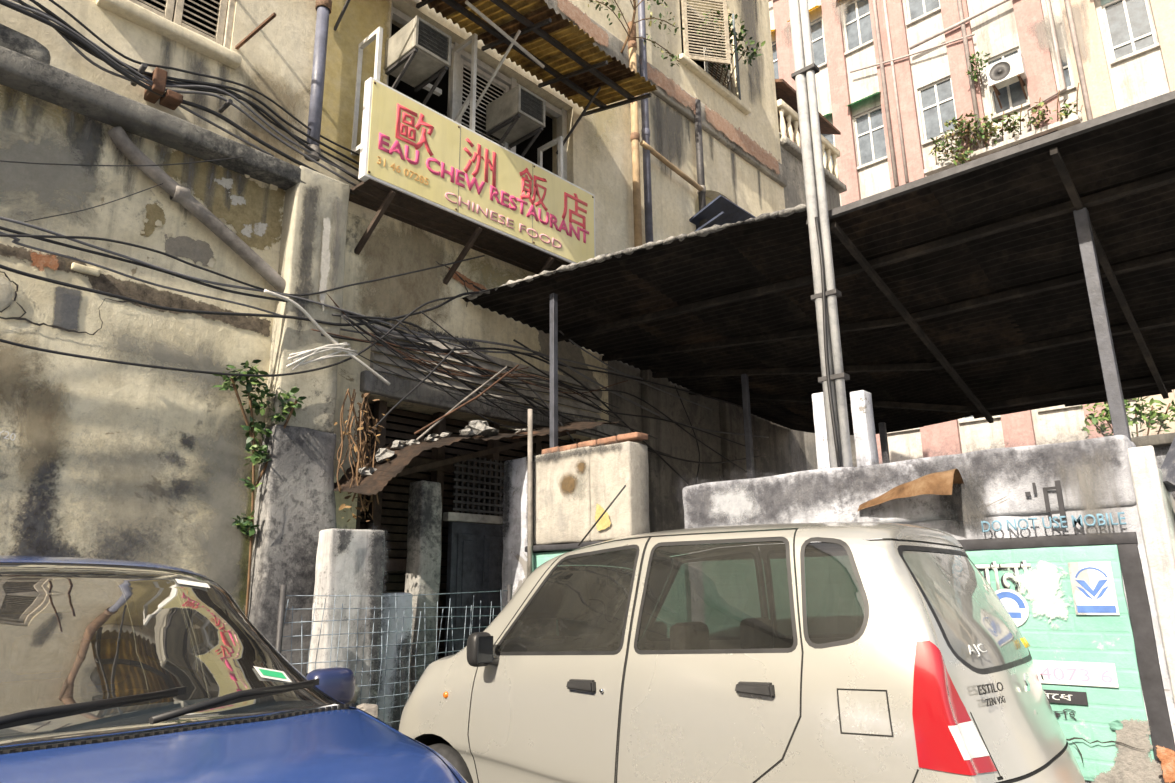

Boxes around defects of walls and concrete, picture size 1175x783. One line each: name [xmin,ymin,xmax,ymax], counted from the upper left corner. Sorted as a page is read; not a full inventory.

flaking render [0,244,271,337]
peeling [140,203,216,268]
peeling [155,146,286,250]
water stain [295,186,319,338]
water stain [332,201,341,289]
water stain [0,339,162,561]
water stain [681,434,1121,531]
peeling [1007,561,1073,629]
flaking render [1091,719,1175,783]